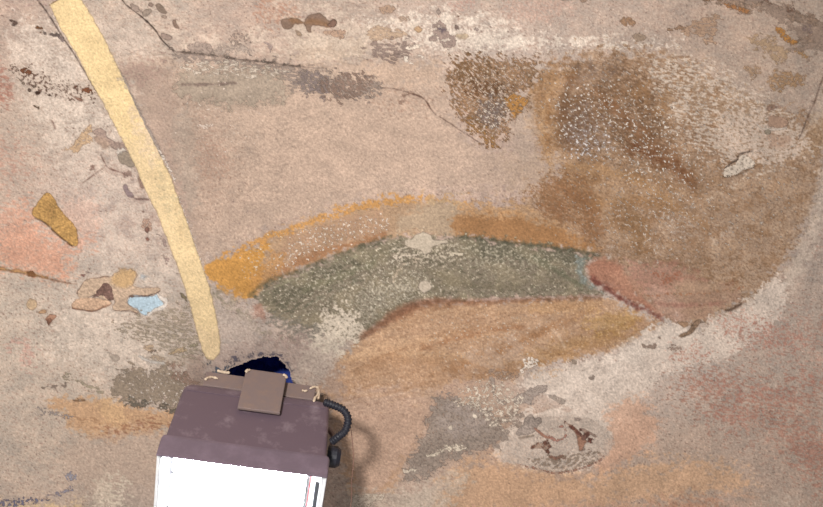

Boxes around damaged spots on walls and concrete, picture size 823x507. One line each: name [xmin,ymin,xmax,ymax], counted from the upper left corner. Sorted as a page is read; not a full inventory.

crack [10,2,89,79]
crack [122,0,235,59]
leakage [170,30,383,142]
leakage [362,35,415,64]
rust [704,0,823,62]
leakage [541,63,799,261]
peeling [72,269,168,316]
leakage [62,297,238,414]
spalling [227,356,293,383]
peeling [426,444,467,457]
leakage [401,315,572,483]
spalling [454,378,602,474]